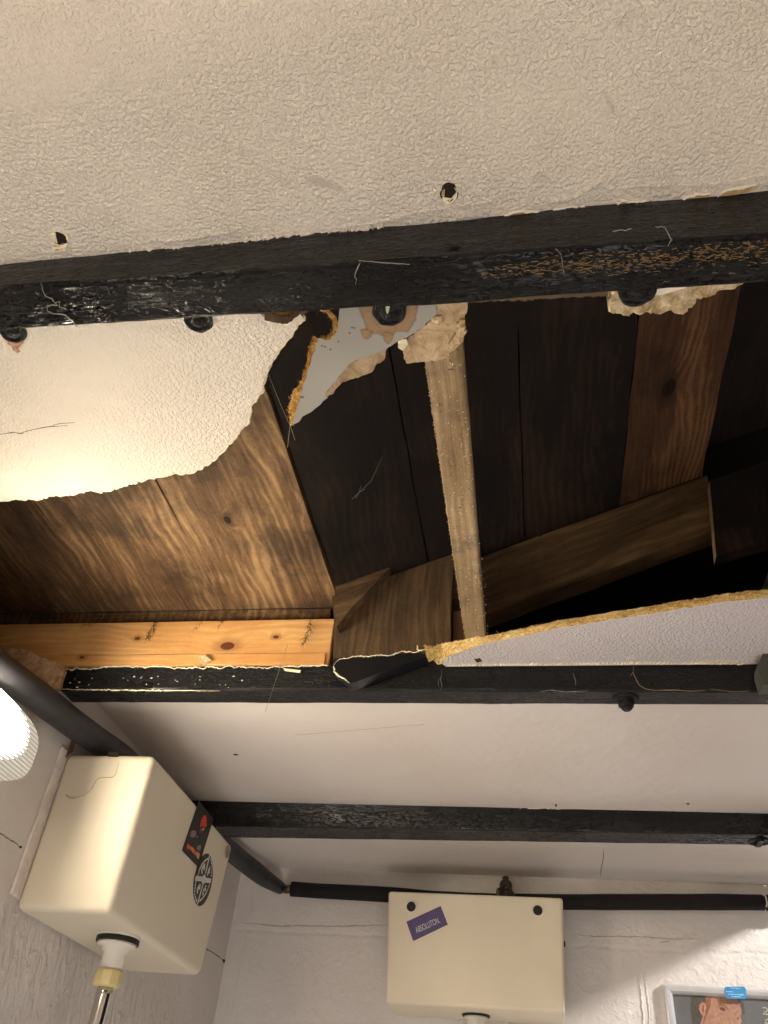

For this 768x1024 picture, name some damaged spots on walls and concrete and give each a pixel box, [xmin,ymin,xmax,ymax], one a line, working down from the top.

peeling [656,287,687,295]
peeling [448,318,467,350]
crack [0,422,75,435]
flaking render [4,648,327,692]
crack [575,934,696,943]